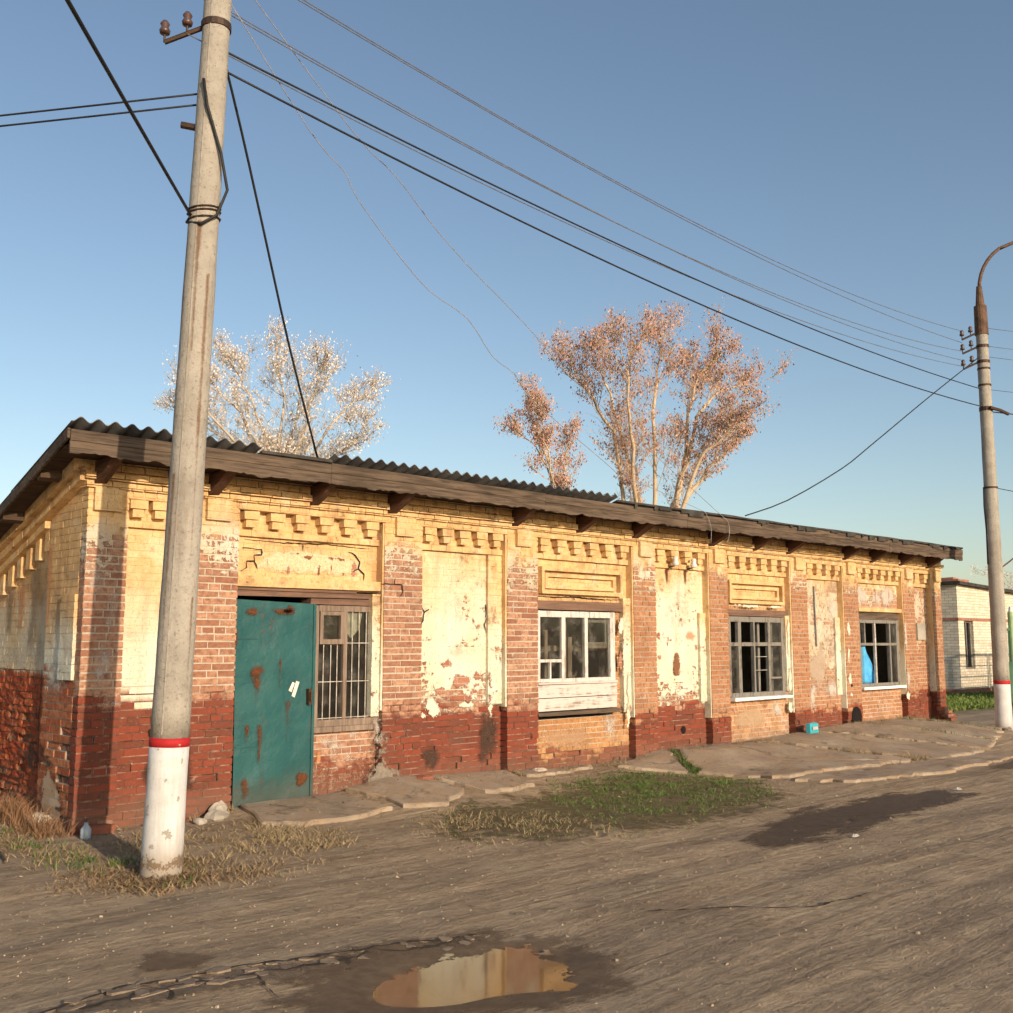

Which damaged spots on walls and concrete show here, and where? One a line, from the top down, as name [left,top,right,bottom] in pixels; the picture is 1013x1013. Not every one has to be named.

peeling [256,549,362,577]
crack [242,539,403,597]
rust [251,667,264,689]
peeling [421,659,494,718]
peeling [657,652,697,710]
peeling [809,646,836,708]
spalling [1,733,62,822]
rust [297,773,308,786]